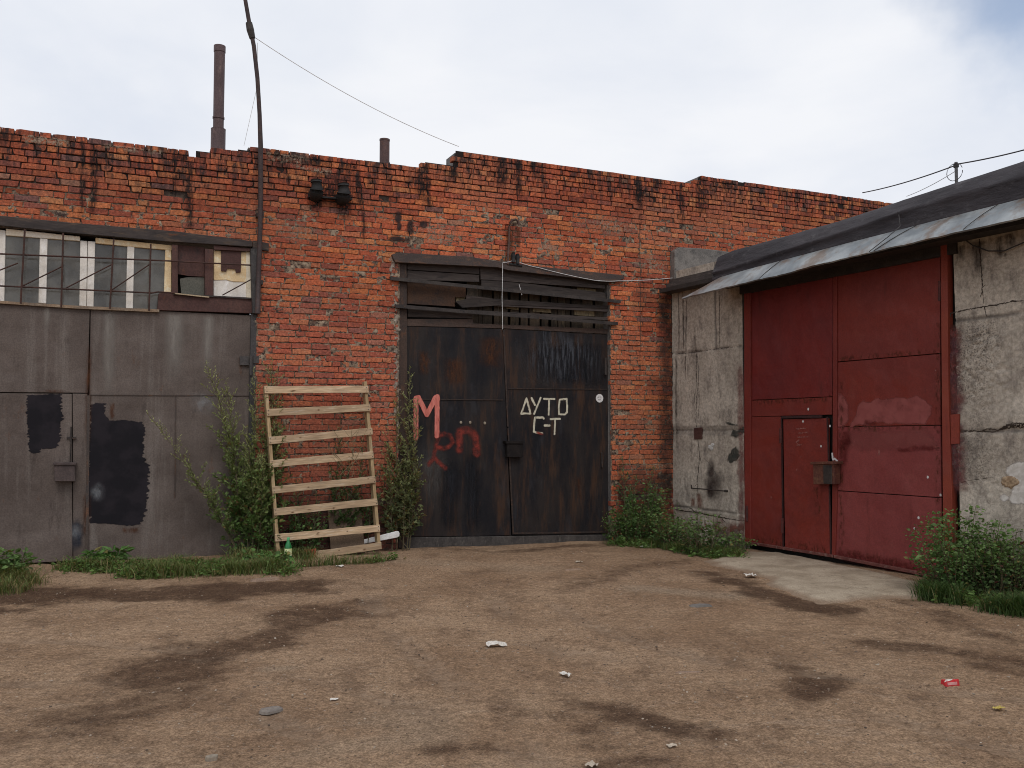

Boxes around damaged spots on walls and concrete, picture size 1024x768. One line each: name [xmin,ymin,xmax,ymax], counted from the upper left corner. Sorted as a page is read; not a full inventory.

leakage [90,143,108,209]
leakage [268,152,328,173]
leakage [515,160,539,194]
crack [950,239,1023,318]
peeling [829,393,932,428]
crack [960,422,1024,433]
flaking render [1000,462,1024,504]